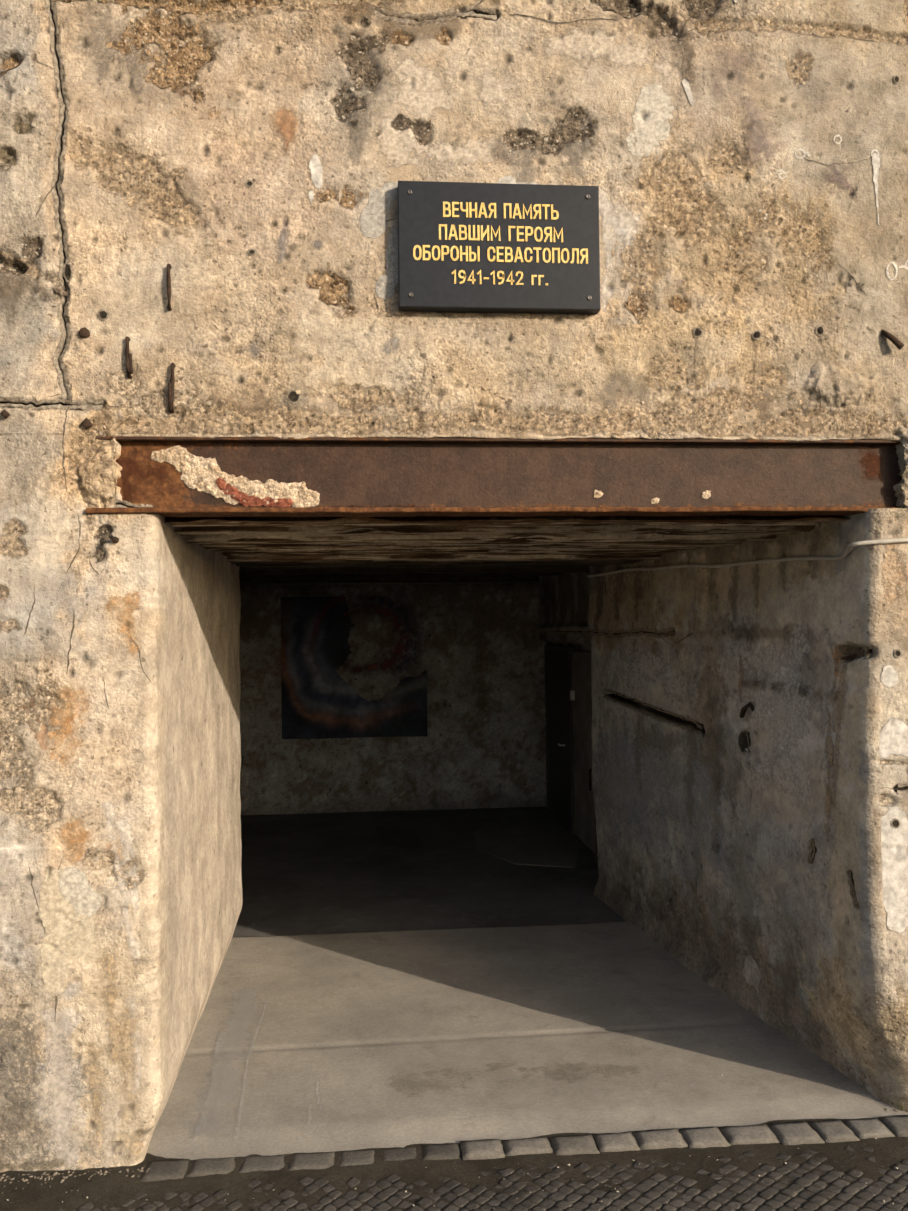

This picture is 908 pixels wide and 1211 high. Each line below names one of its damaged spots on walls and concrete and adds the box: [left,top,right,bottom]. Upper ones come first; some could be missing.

spalling [52,0,432,146]
spalling [434,26,451,45]
spalling [59,130,214,237]
spalling [503,106,598,155]
crack [0,0,157,575]
spalling [306,262,360,320]
spalling [42,348,908,485]
corrosion [115,455,168,504]
spalling [0,679,63,834]